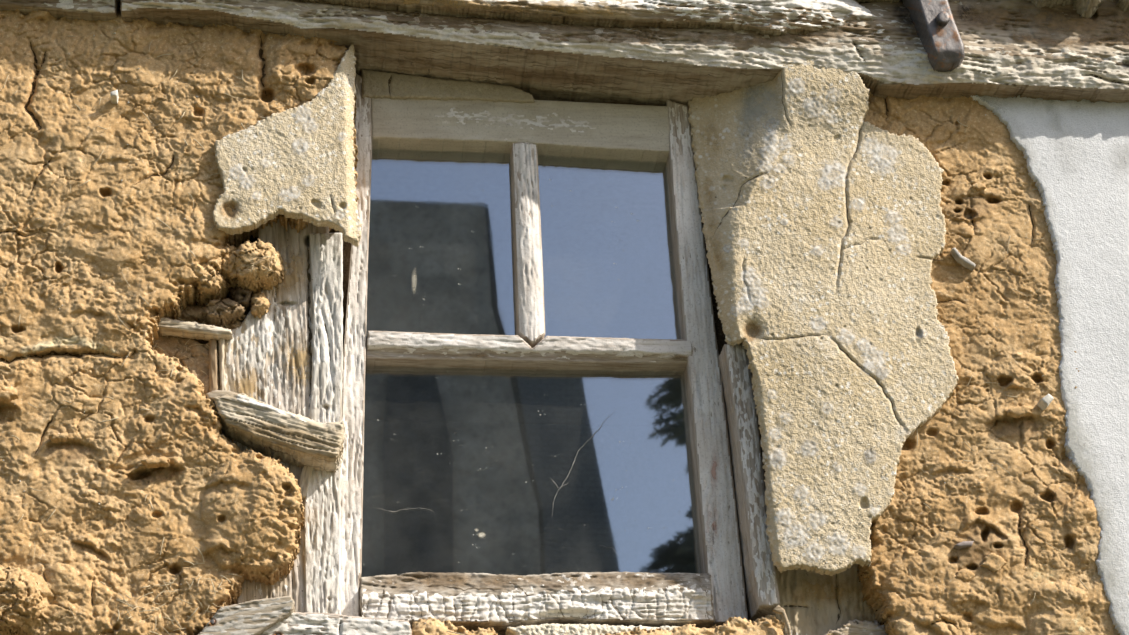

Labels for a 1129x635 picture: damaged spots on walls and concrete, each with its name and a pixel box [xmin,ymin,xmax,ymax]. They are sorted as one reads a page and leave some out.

crack [24,42,46,134]
crack [258,33,266,94]
peeling [44,0,1129,90]
crack [133,150,175,185]
crack [836,99,889,293]
spalling [944,182,987,218]
crack [1,343,148,363]
spalling [0,390,19,420]
crack [766,334,905,429]
spalling [992,394,1054,437]
spalling [137,457,172,483]
spalling [954,533,1007,582]